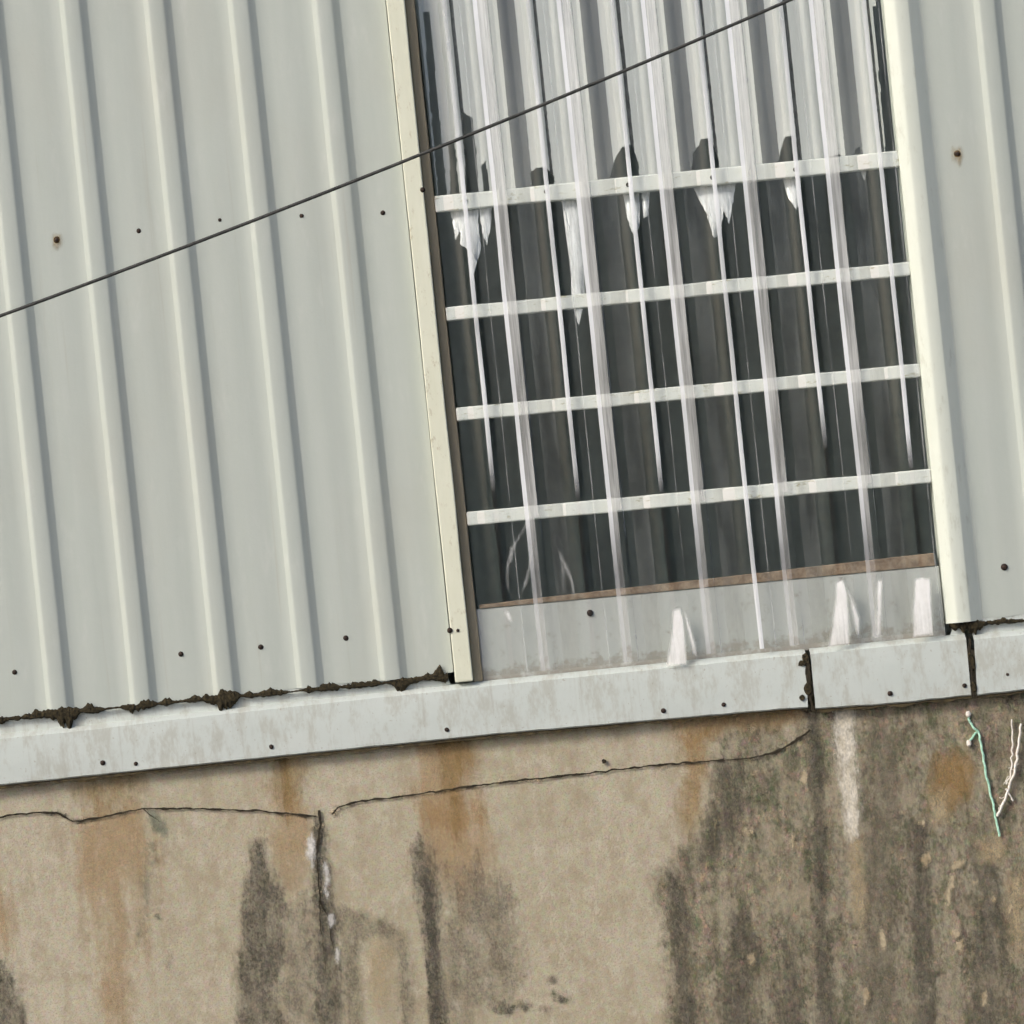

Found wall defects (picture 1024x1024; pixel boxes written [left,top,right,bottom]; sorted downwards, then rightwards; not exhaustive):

water stain [238,818,406,1024]
crack [0,729,810,970]
water stain [412,840,527,1024]
water stain [656,692,1024,1024]